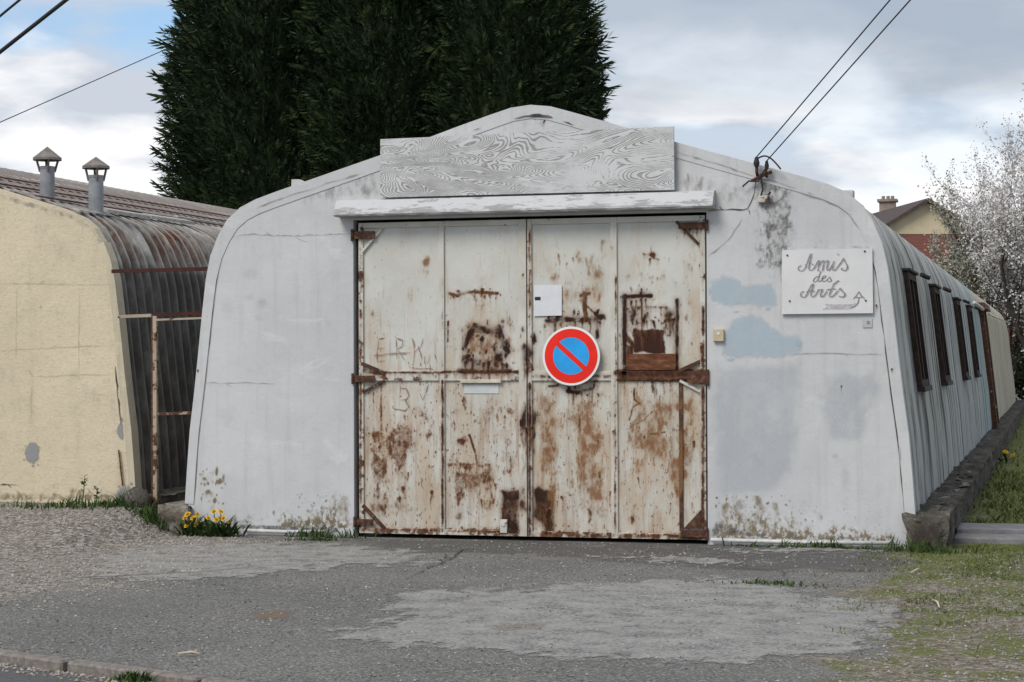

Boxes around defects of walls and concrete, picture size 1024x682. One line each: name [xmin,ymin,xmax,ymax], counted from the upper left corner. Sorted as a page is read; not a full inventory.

leakage [760,187,791,266]
peeling [709,278,801,360]
corrosion [359,277,717,539]
flaking render [23,443,40,467]
leakage [713,496,892,541]